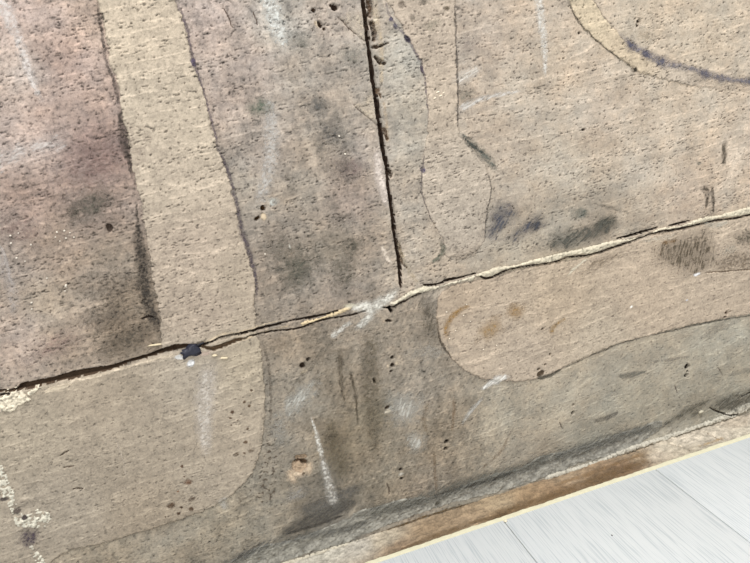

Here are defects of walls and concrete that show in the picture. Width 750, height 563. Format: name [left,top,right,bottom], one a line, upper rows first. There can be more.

crack [337,0,750,313]
crack [0,310,365,396]